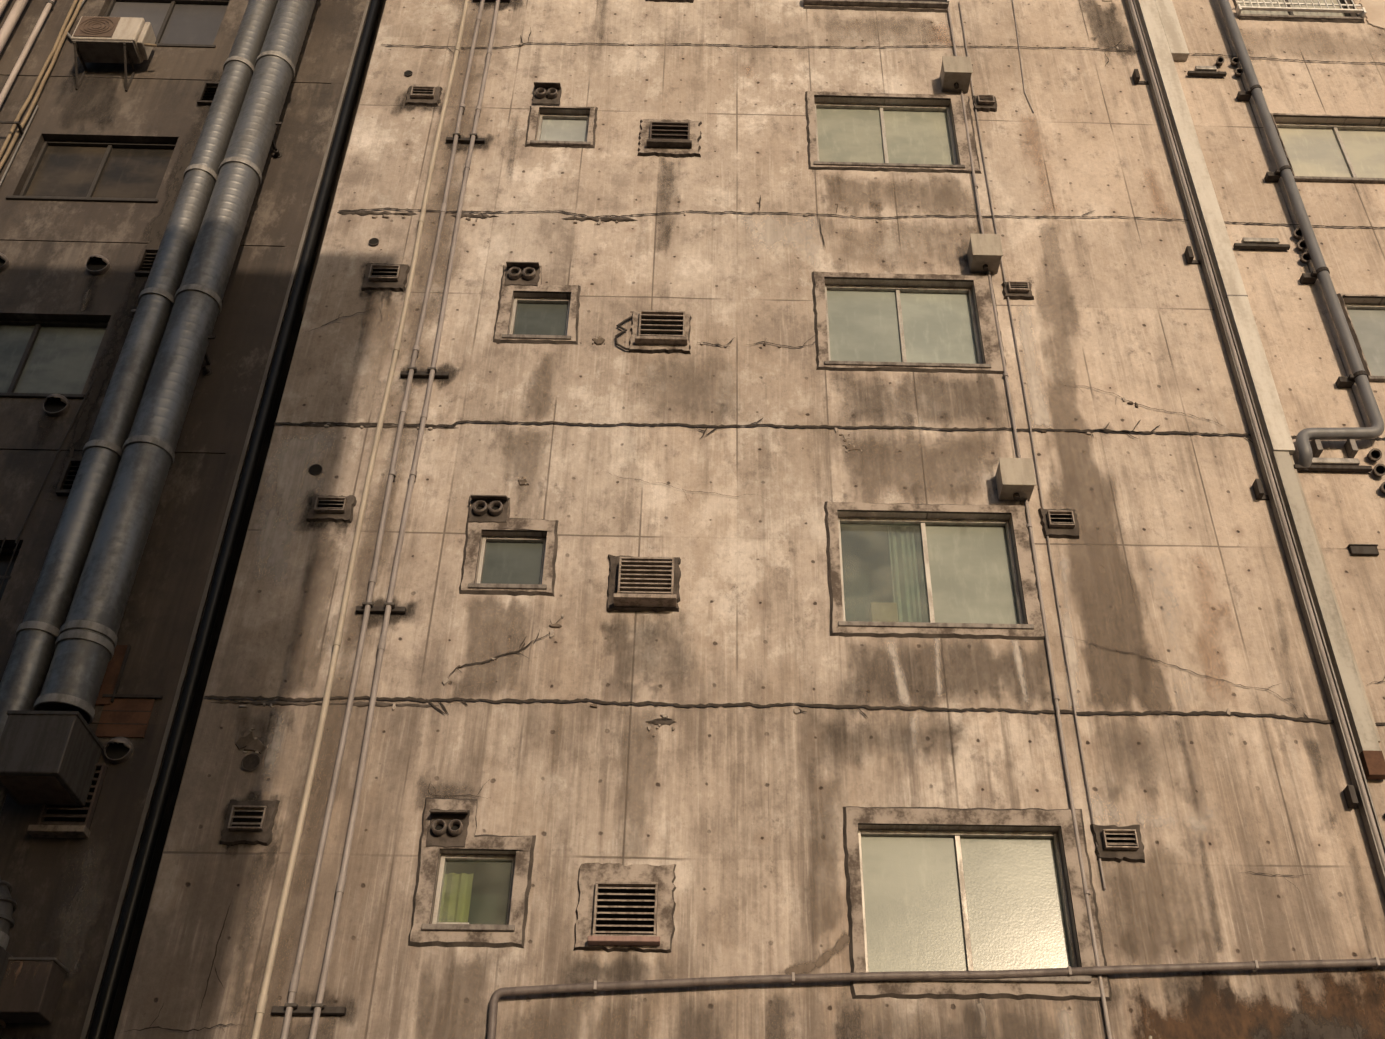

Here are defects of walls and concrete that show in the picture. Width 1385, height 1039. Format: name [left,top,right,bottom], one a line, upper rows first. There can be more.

water stain [659,161,673,209]
water stain [837,372,998,420]
water stain [1020,306,1172,716]
crack [204,614,1385,725]
water stain [856,639,1047,731]
water stain [1206,869,1221,949]
corrosion [1133,967,1385,1039]